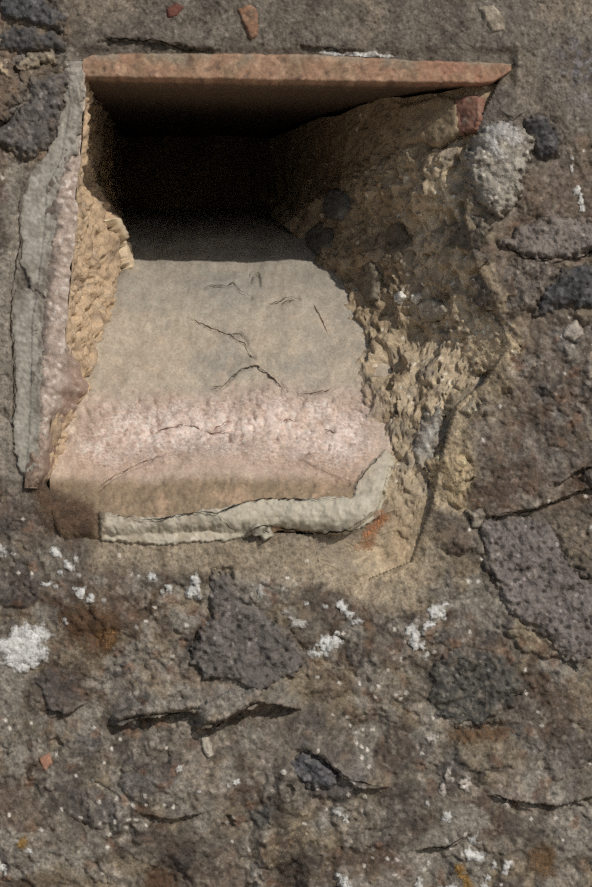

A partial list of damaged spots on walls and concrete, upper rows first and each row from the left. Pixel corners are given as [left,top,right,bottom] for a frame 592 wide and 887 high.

peeling [10,71,87,477]
crack [195,320,332,394]
spalling [72,84,500,579]
crack [269,296,327,331]
crack [151,421,235,434]
crack [494,490,584,514]